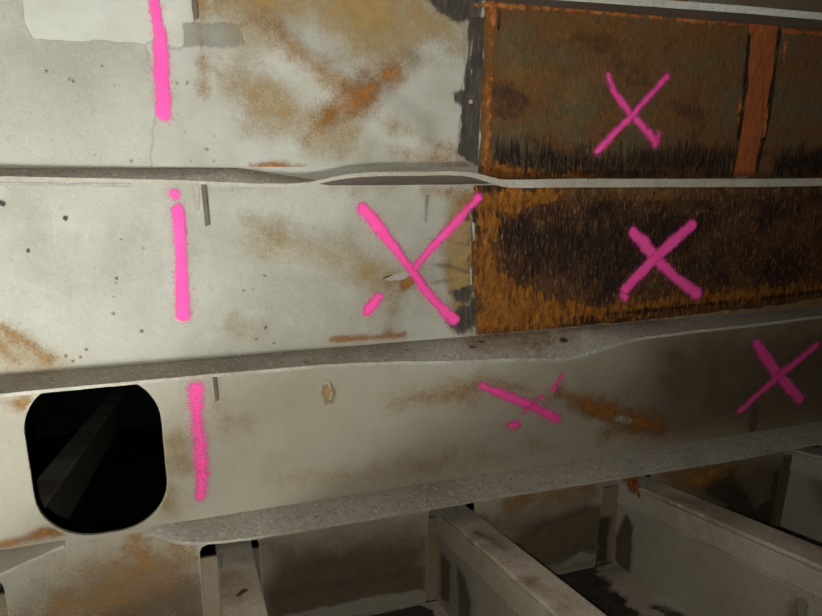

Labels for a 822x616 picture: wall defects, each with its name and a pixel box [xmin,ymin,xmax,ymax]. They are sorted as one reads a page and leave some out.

rust [234,65,402,142]
rust [469,1,822,335]
rust [556,391,663,433]
leakage [114,588,204,616]
leakage [268,544,435,616]
leakage [514,507,639,616]